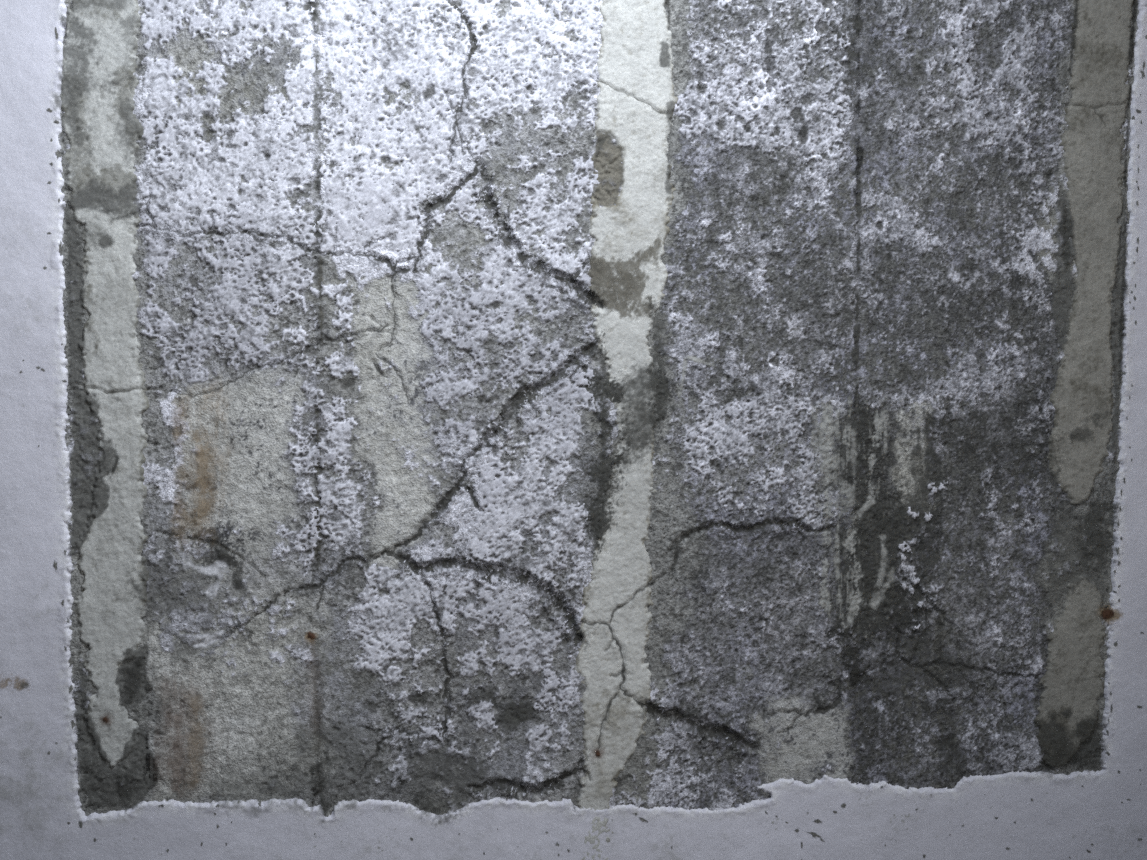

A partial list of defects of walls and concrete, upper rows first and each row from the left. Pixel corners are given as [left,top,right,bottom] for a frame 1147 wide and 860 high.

peeling [675,0,854,163]
peeling [882,0,1059,186]
crack [83,0,603,398]
flaking render [47,199,118,569]
peeling [139,0,623,590]
peeling [682,391,840,526]
flaking render [1111,144,1140,462]
flaking render [64,644,158,810]
peeling [355,564,577,754]
crack [228,342,843,809]
crack [771,576,1030,732]
rust [1100,605,1120,621]